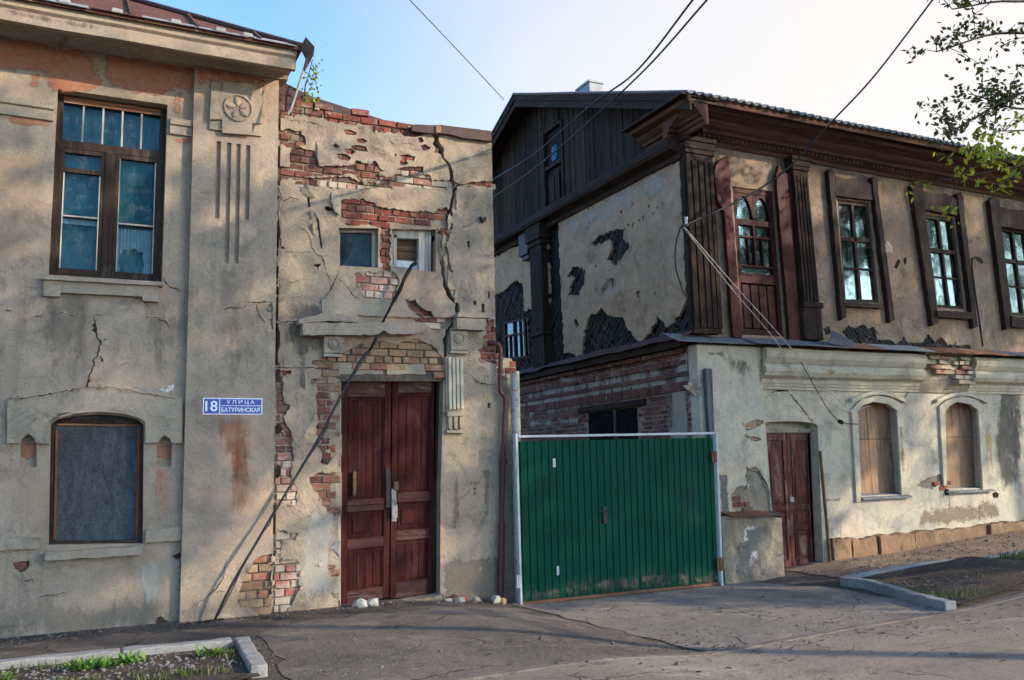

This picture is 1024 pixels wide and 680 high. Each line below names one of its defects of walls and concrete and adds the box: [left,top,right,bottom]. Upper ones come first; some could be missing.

peeling [0,37,266,113]
crack [224,115,357,383]
spalling [278,100,496,333]
crack [431,185,479,313]
crack [8,287,182,402]
spalling [917,351,977,384]
crack [274,461,282,478]
spalling [273,370,298,507]
spalling [309,338,447,516]
spalling [719,465,770,512]
damp [988,394,1021,484]
spalling [237,530,304,615]